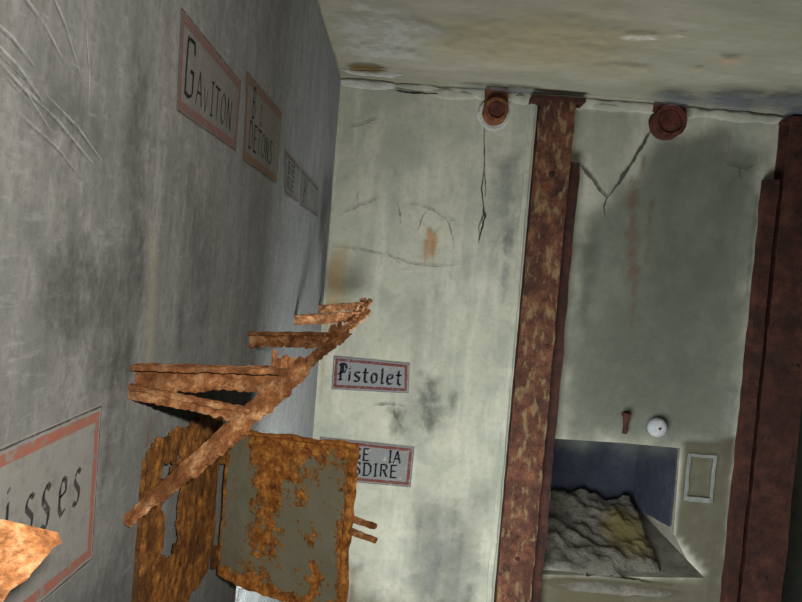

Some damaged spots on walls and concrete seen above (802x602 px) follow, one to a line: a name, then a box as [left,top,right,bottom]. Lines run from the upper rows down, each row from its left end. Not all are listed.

crack [478,130,486,242]
crack [580,131,651,215]
crack [340,204,469,267]